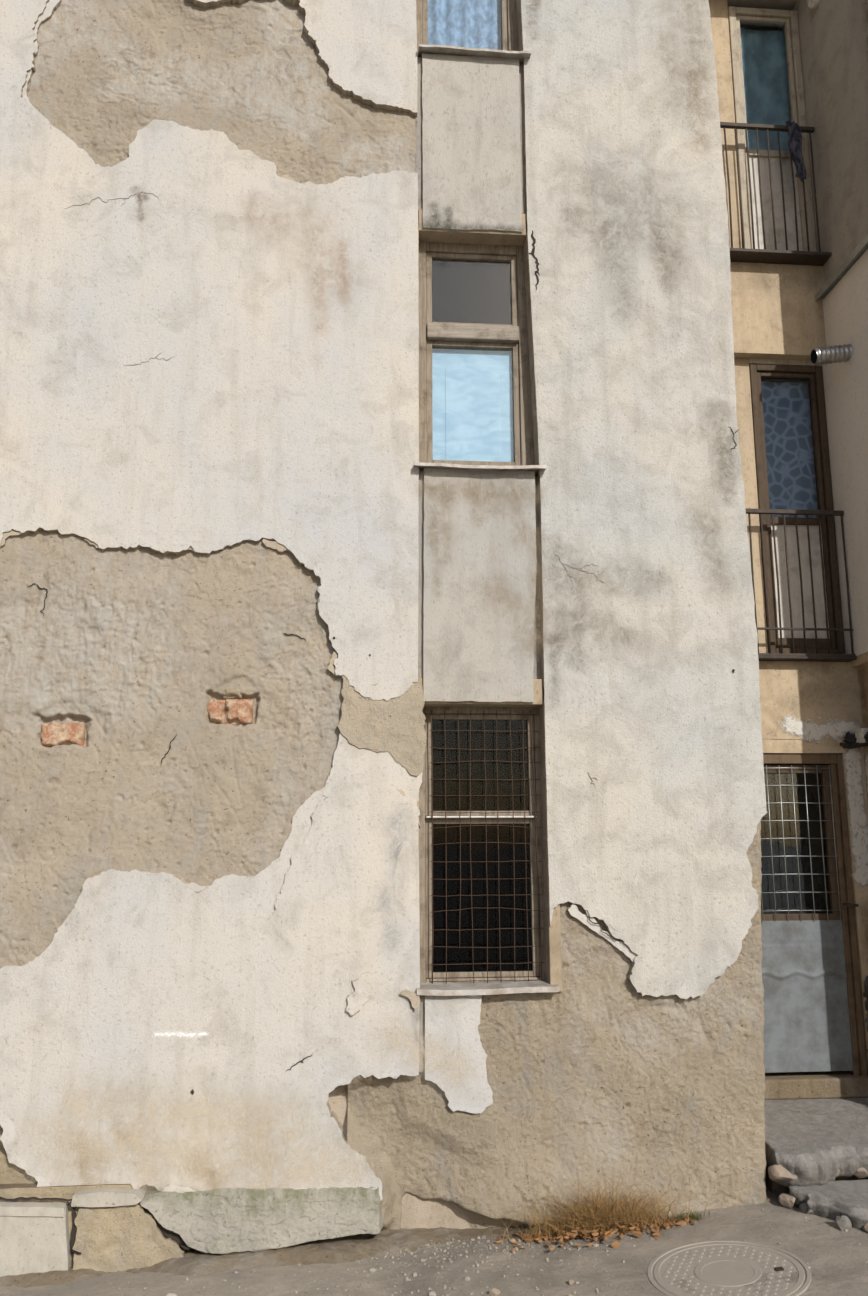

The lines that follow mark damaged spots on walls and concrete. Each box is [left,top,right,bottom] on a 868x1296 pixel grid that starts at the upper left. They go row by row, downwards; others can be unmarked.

spalling [22,0,416,185]
crack [529,230,540,290]
spalling [0,529,427,969]
spalling [347,820,766,1230]
spalling [0,1126,38,1184]